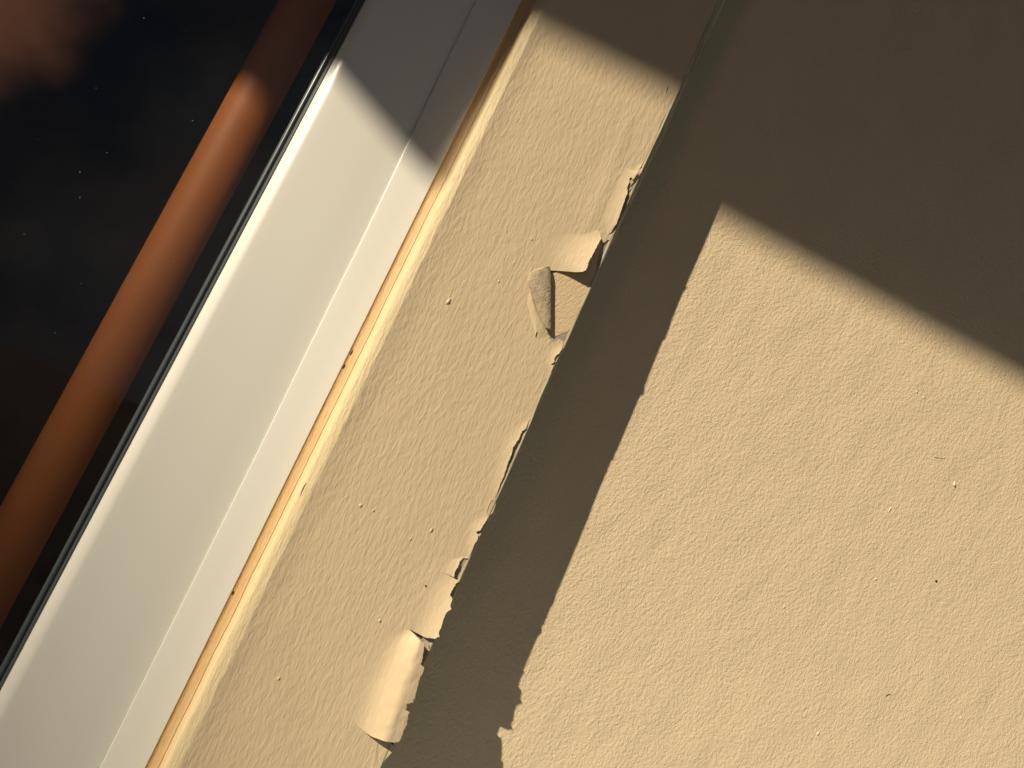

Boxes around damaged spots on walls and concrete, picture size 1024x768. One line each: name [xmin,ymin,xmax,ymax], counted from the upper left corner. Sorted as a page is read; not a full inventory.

peeling [527,161,643,372]
peeling [350,417,531,743]